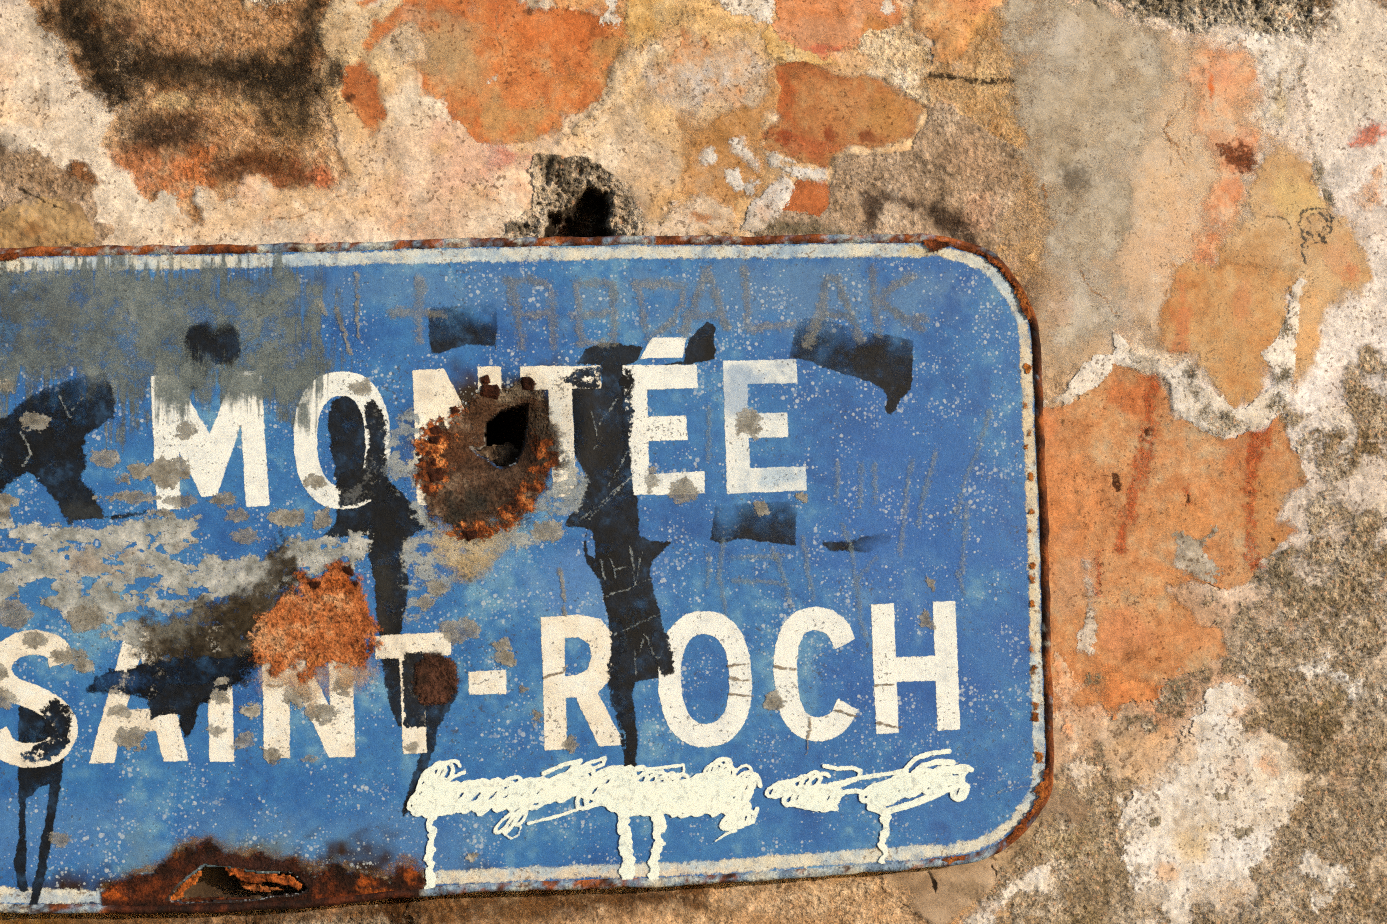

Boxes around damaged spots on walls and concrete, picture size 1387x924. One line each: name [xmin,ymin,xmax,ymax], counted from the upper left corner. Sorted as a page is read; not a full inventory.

leakage [39,0,345,140]
leakage [135,116,198,149]
flaking render [28,0,693,227]
flaking render [0,139,115,247]
leakage [214,152,307,181]
spalling [544,189,612,238]
peeling [643,0,1373,738]
peeling [164,858,1054,924]
peeling [1298,850,1357,913]